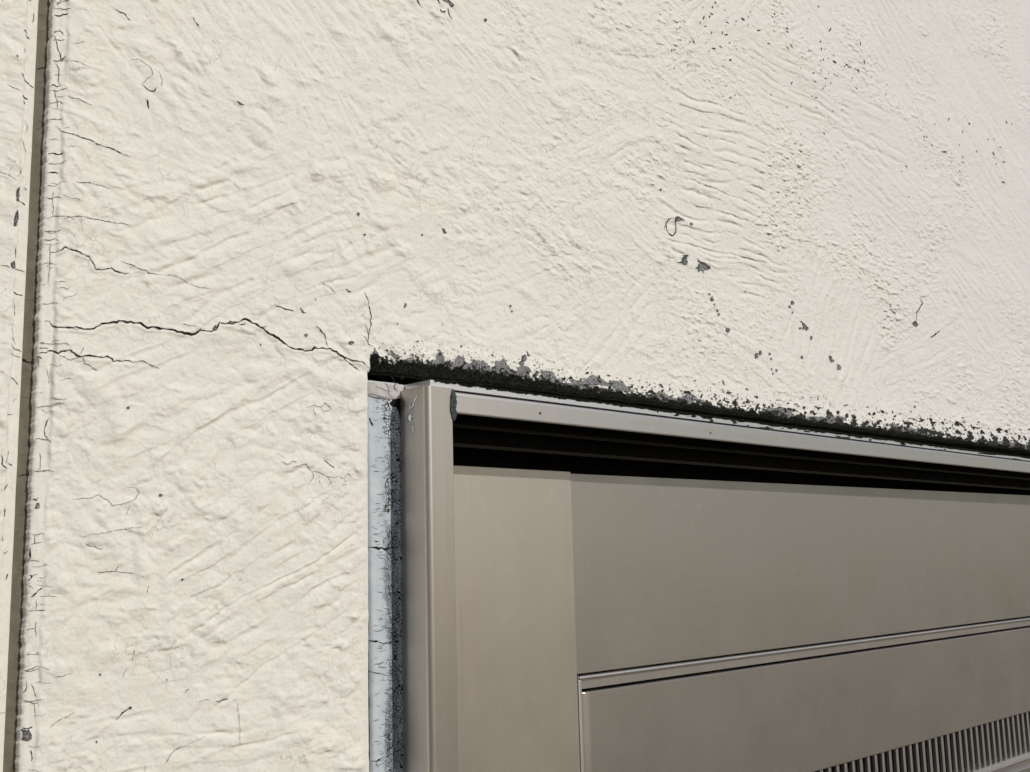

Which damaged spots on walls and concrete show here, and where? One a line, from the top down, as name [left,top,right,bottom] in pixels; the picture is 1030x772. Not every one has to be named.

crack [0,0,404,772]
leakage [369,338,1030,459]